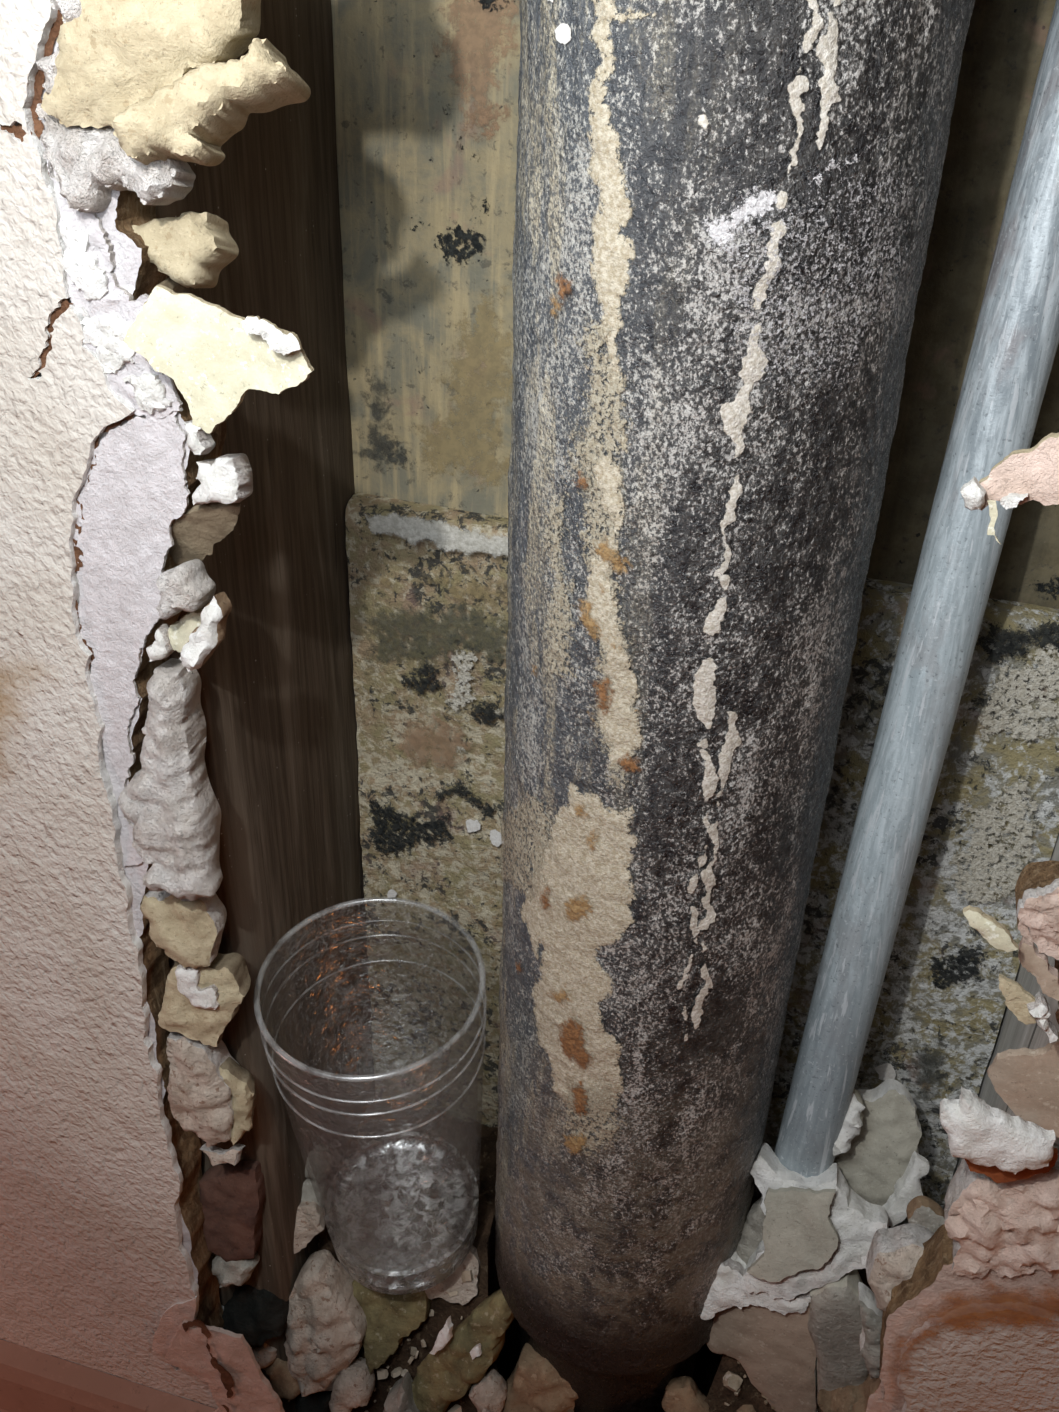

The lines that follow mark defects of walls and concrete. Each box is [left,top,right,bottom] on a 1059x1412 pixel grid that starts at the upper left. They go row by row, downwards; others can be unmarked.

crack [1,10,63,177]
crack [31,298,74,378]
spalling [35,103,223,901]
water stain [359,0,656,1161]
rust [595,539,630,572]
rust [593,678,613,714]
water stain [978,575,1059,747]
rust [539,887,593,921]
water stain [928,946,984,989]
water stain [950,779,1041,904]
spalling [963,878,1059,960]
spalling [944,1142,1059,1278]